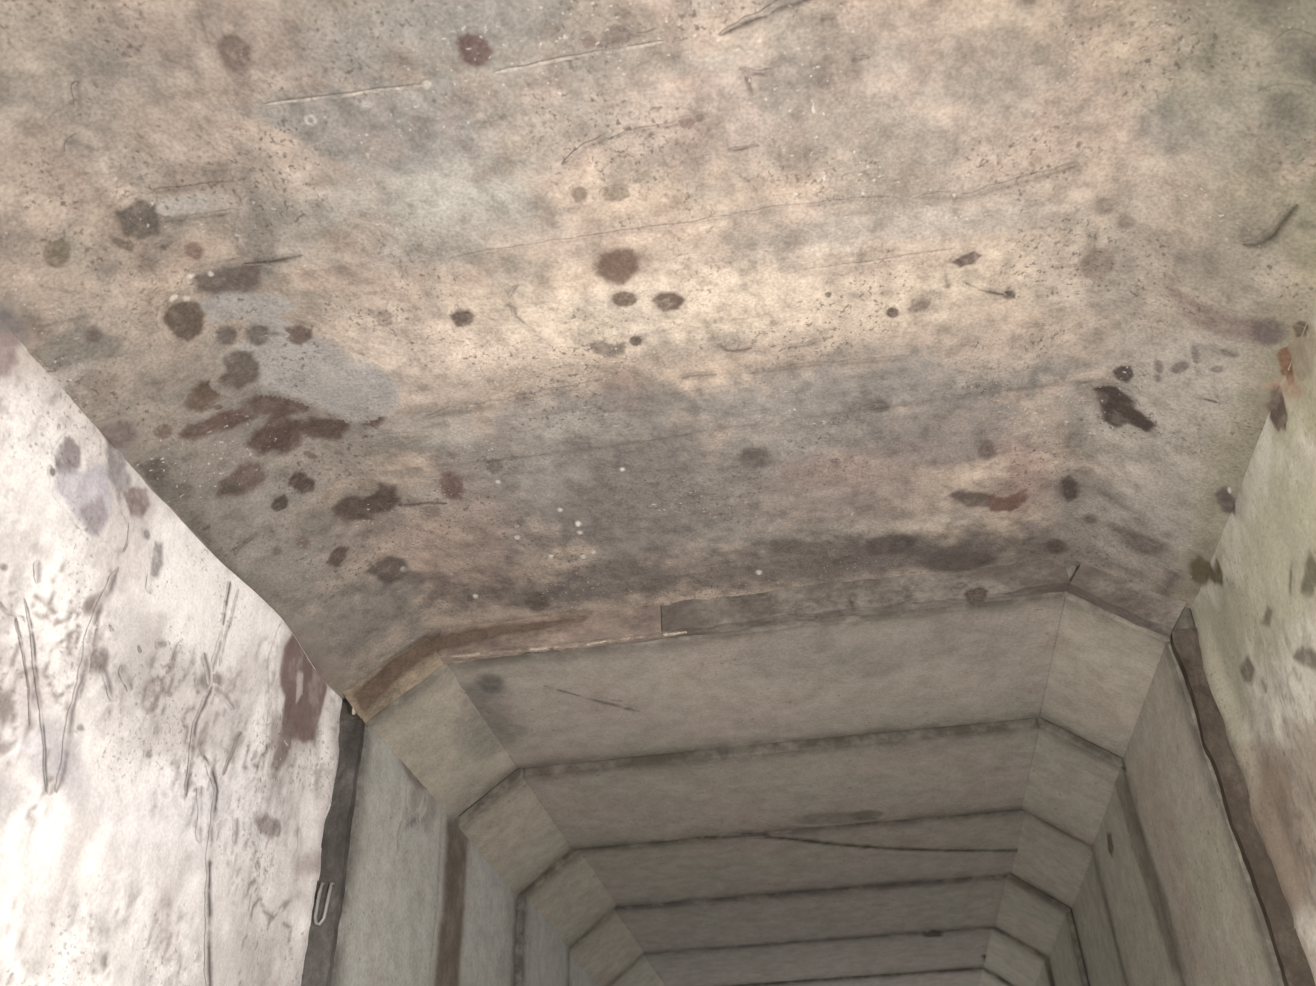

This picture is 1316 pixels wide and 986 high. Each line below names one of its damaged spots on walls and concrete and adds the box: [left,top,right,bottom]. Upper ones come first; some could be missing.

rust [0,295,34,386]
water stain [1151,278,1294,384]
water stain [733,442,777,473]
water stain [135,455,248,581]
mould [1056,472,1102,526]
mould [1209,482,1238,520]
water stain [142,527,166,594]
water stain [855,531,1002,574]
mould [1177,548,1228,598]
water stain [519,588,555,615]
rust [266,615,585,777]
crack [696,833,1018,854]